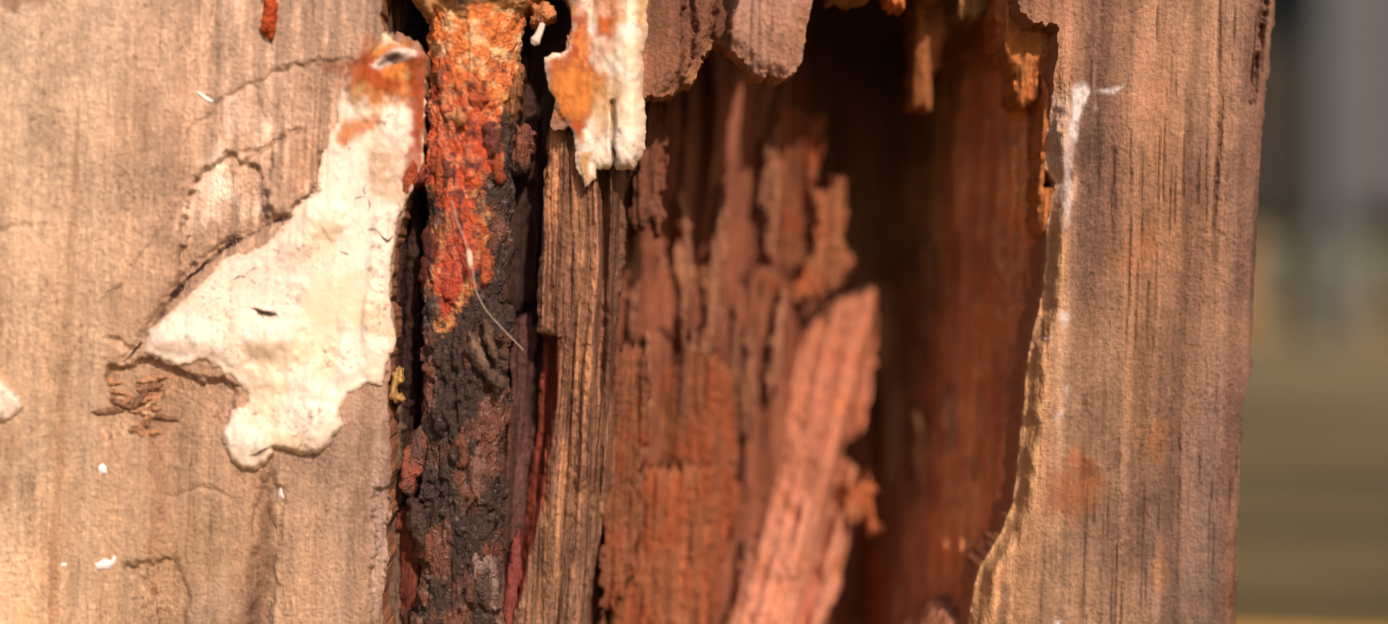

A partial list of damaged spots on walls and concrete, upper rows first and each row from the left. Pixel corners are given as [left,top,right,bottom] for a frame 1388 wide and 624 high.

peeling [380,34,420,52]
peeling [544,0,648,187]
peeling [91,66,427,470]
rust [418,225,437,286]
rust [476,239,495,289]
rust [464,315,506,393]
peeling [0,378,24,423]
rust [399,425,434,566]
rust [453,423,483,504]
rust [468,540,502,612]
rust [410,612,424,624]